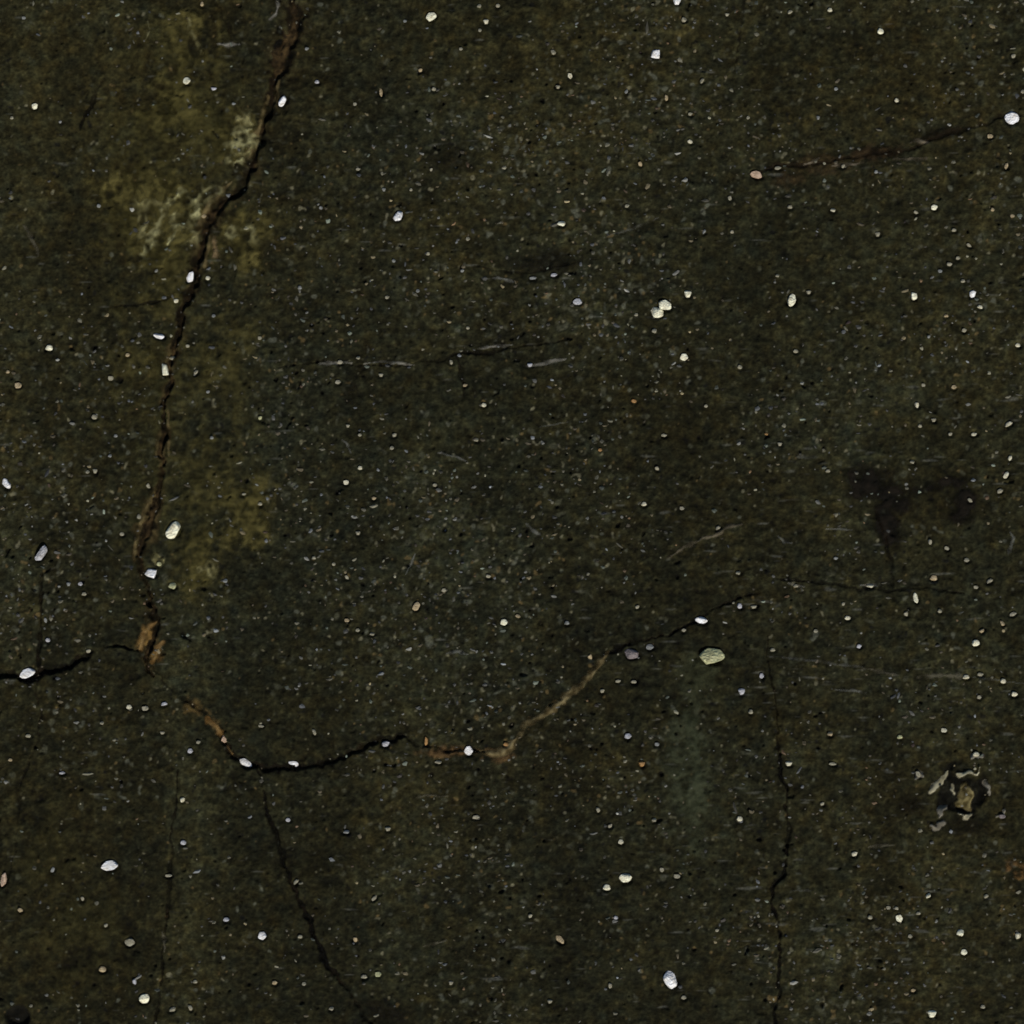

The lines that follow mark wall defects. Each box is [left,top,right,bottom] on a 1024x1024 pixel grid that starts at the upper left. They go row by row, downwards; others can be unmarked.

crack [113,0,303,678]
crack [316,359,409,367]
crack [450,345,497,368]
crack [532,339,569,366]
crack [675,525,735,554]
crack [8,595,87,686]
crack [464,594,754,757]
crack [766,647,789,818]
spalling [915,753,991,831]
crack [224,733,407,985]
crack [770,846,788,1024]